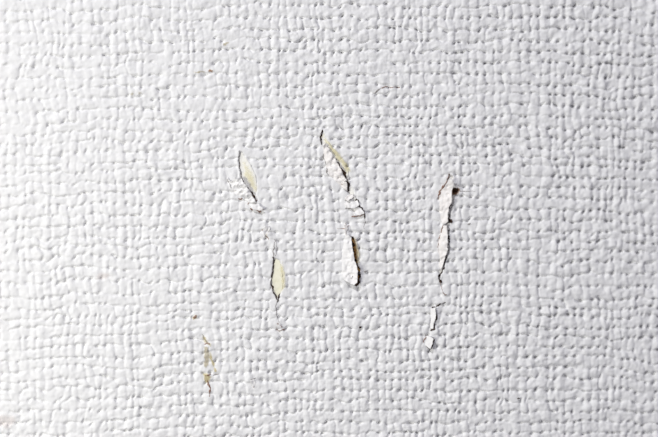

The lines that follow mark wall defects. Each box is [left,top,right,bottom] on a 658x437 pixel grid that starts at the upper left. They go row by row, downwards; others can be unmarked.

peeling [227,152,264,213]
peeling [320,130,366,225]
peeling [262,226,285,331]
peeling [337,223,361,286]
peeling [423,174,475,350]